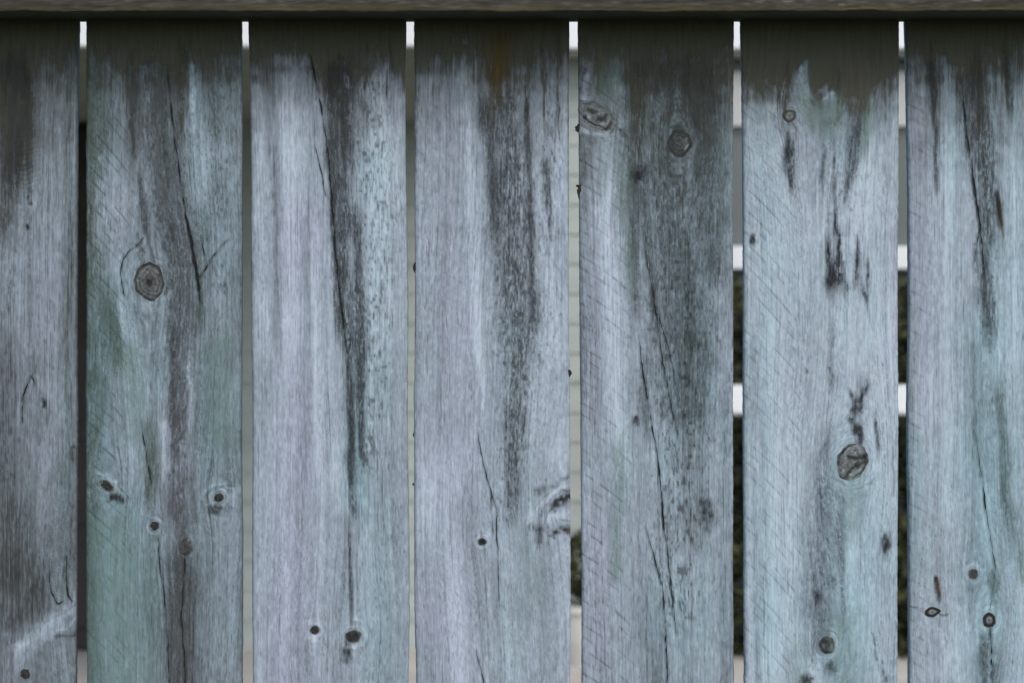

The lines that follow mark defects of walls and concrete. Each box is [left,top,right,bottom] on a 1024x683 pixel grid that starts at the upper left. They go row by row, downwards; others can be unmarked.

crack [167,67,224,302]
damp [0,20,569,683]
crack [638,239,678,681]
damp [578,20,1024,301]
crack [961,78,985,275]
damp [981,254,995,334]